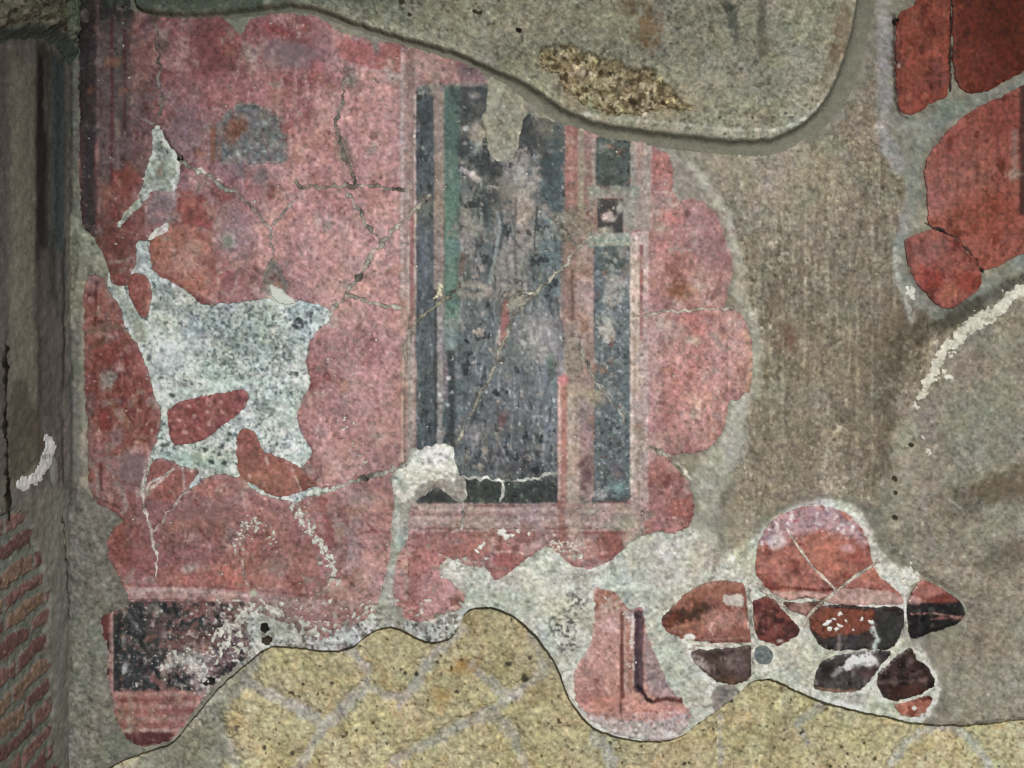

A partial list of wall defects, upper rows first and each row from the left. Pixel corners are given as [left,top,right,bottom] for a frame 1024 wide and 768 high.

flaking render [117,126,181,227]
peeling [213,105,288,166]
crack [179,75,461,362]
spalling [539,45,690,119]
crack [455,214,595,446]
leakage [916,284,1024,401]
flaking render [108,223,339,586]
crack [140,457,190,577]
crack [456,471,560,530]
peeling [497,528,531,540]
crack [686,529,881,674]
peeling [823,611,874,631]